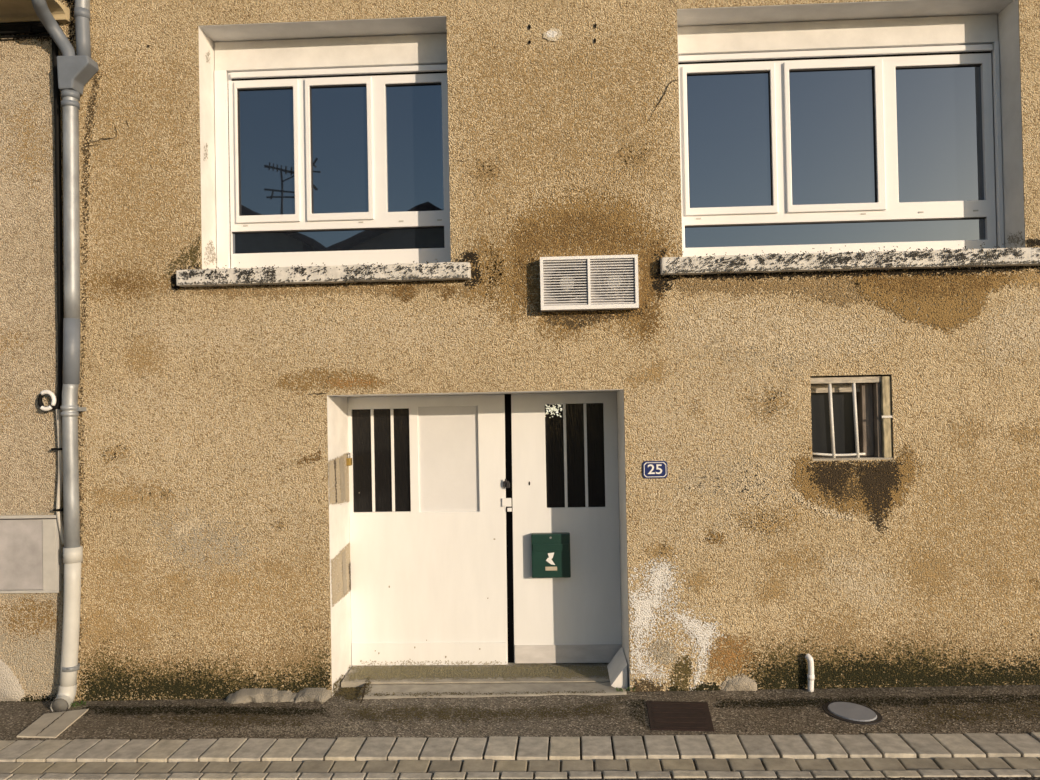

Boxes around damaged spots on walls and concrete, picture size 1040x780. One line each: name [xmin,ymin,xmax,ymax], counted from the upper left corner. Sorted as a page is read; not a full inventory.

leakage [79,10,1040,391]
leakage [84,440,190,517]
leakage [75,515,331,701]
leakage [628,537,727,691]
leakage [738,379,801,429]
leakage [704,408,1040,689]